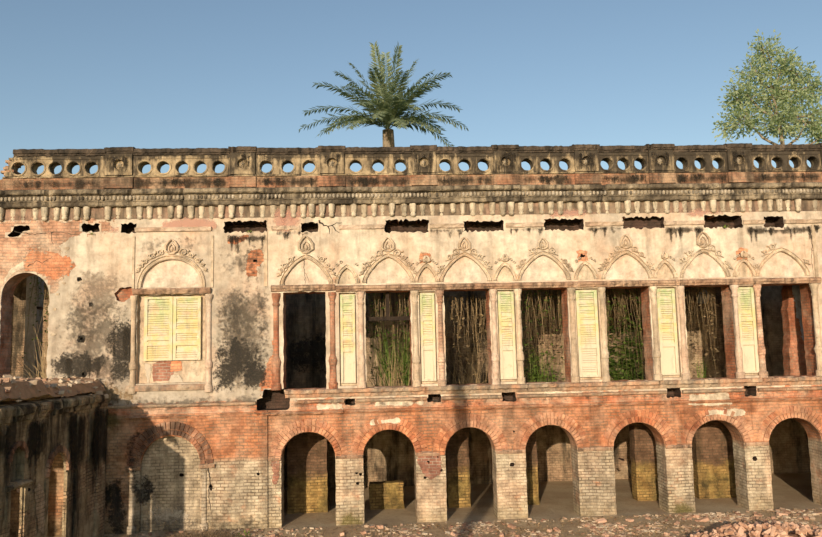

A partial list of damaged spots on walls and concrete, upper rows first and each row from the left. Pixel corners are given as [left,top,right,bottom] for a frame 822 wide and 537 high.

flaking render [0,217,116,295]
flaking render [228,235,264,278]
spalling [115,287,134,302]
leakage [51,319,151,385]
flaking render [152,361,173,382]
leakage [212,335,267,391]
leakage [28,423,45,468]
leakage [71,410,108,480]
spalling [417,450,442,480]